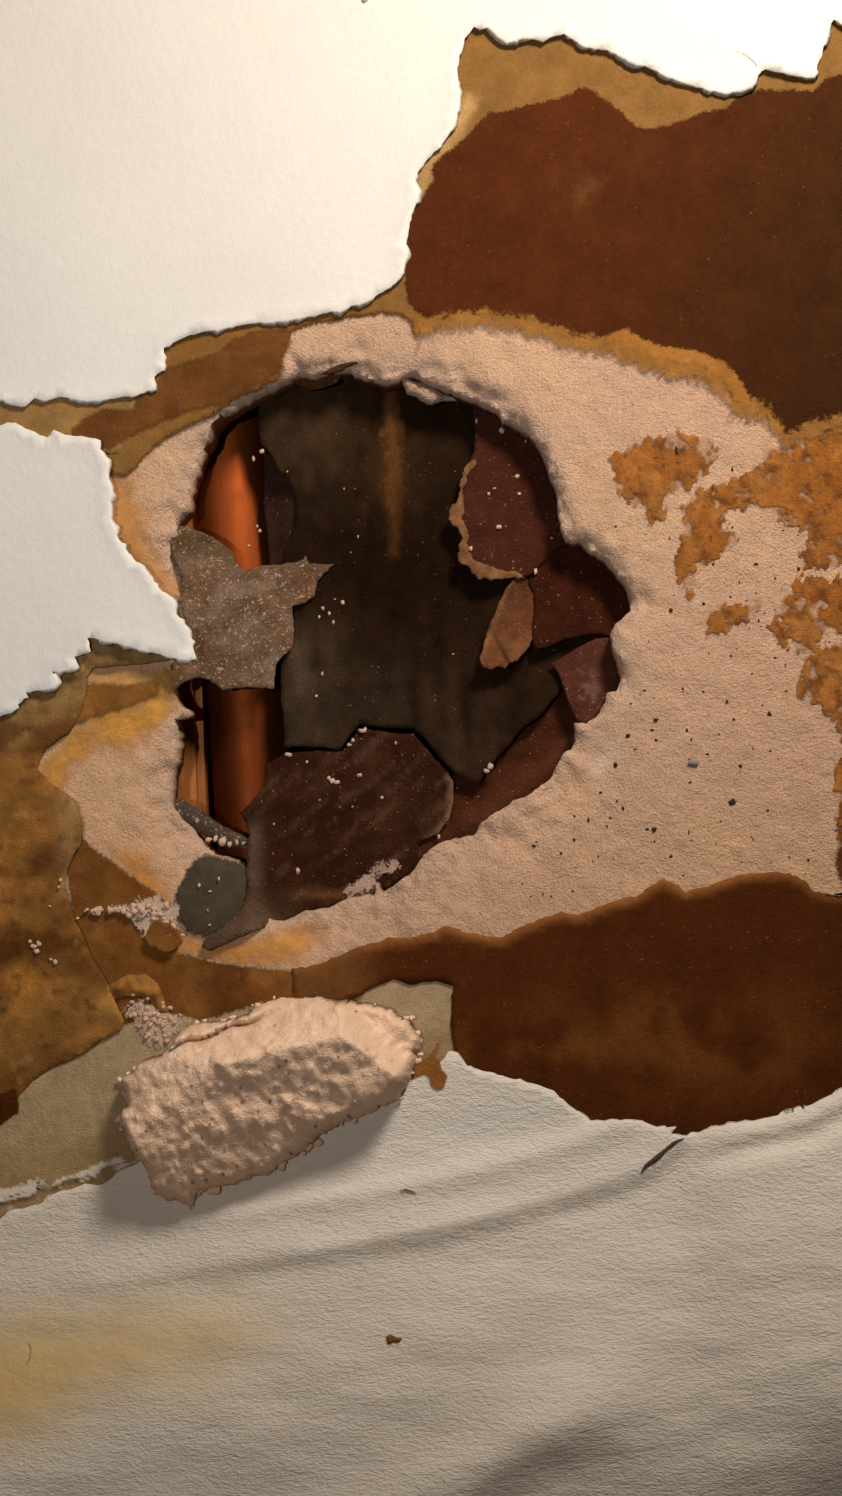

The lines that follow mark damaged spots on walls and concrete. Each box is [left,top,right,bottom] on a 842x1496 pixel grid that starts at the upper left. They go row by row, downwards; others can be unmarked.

leakage [405,74,842,447]
leakage [43,671,170,789]
flaking render [37,311,842,970]
leakage [0,1089,19,1124]